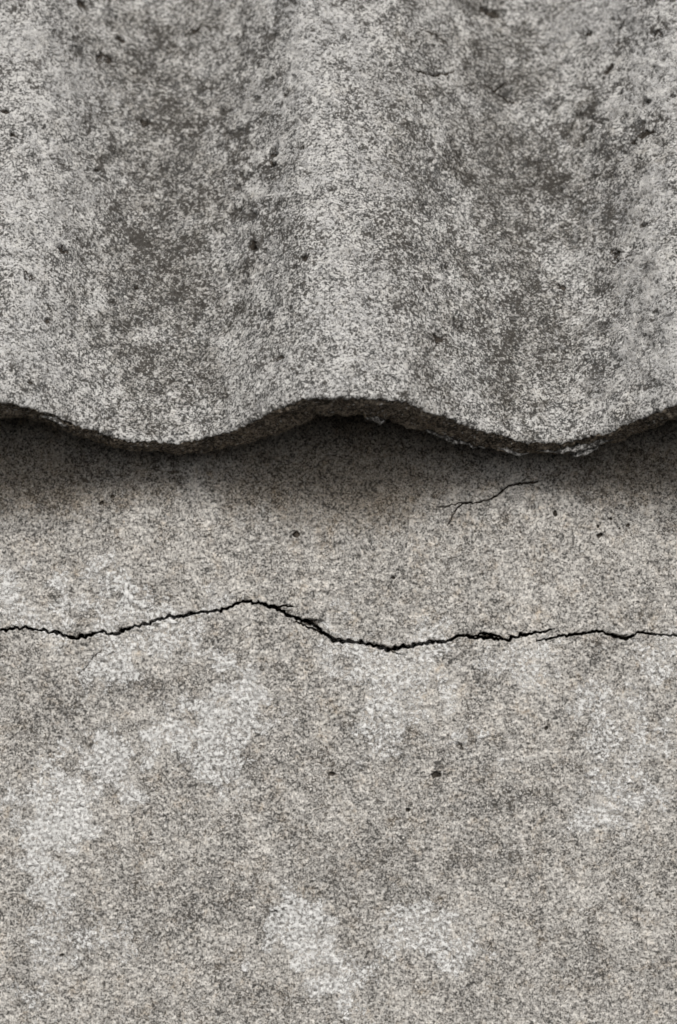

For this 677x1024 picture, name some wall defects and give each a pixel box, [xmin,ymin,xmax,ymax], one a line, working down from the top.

crack [436,481,538,526]
crack [0,599,677,675]